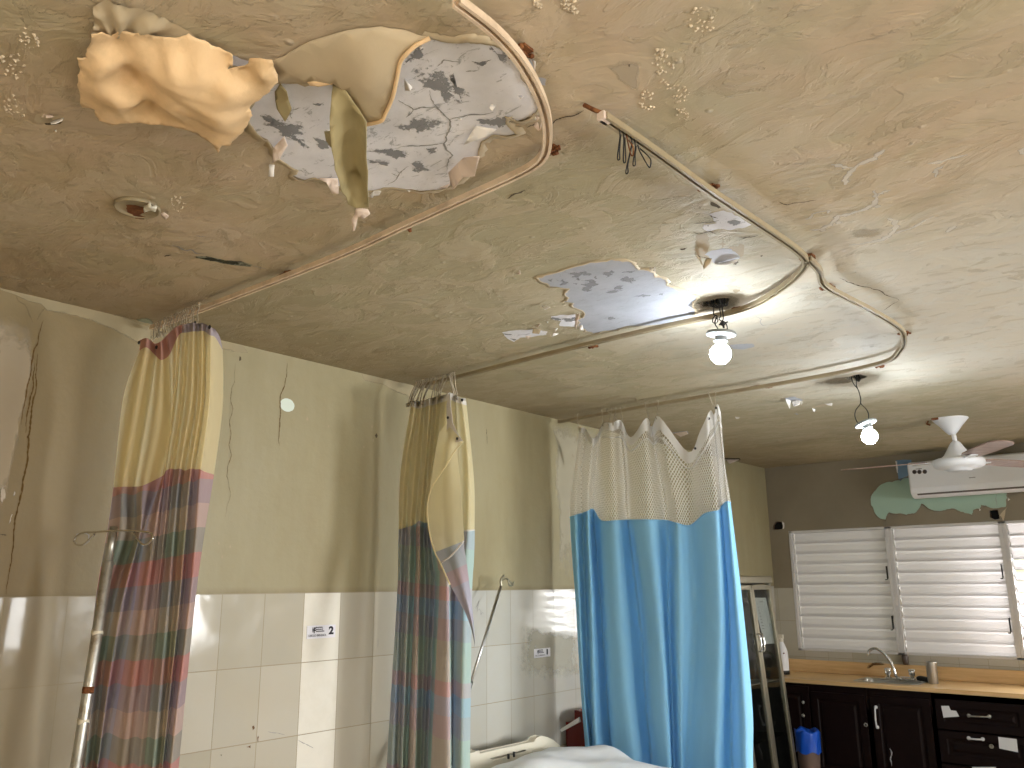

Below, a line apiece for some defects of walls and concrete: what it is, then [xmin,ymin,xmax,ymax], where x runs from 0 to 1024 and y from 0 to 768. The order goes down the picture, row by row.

peeling [77,0,546,232]
crack [164,236,265,269]
peeling [680,201,755,269]
peeling [502,258,700,342]
crack [0,296,45,589]
crack [225,371,235,517]
crack [278,363,288,446]
peeling [870,460,1010,521]